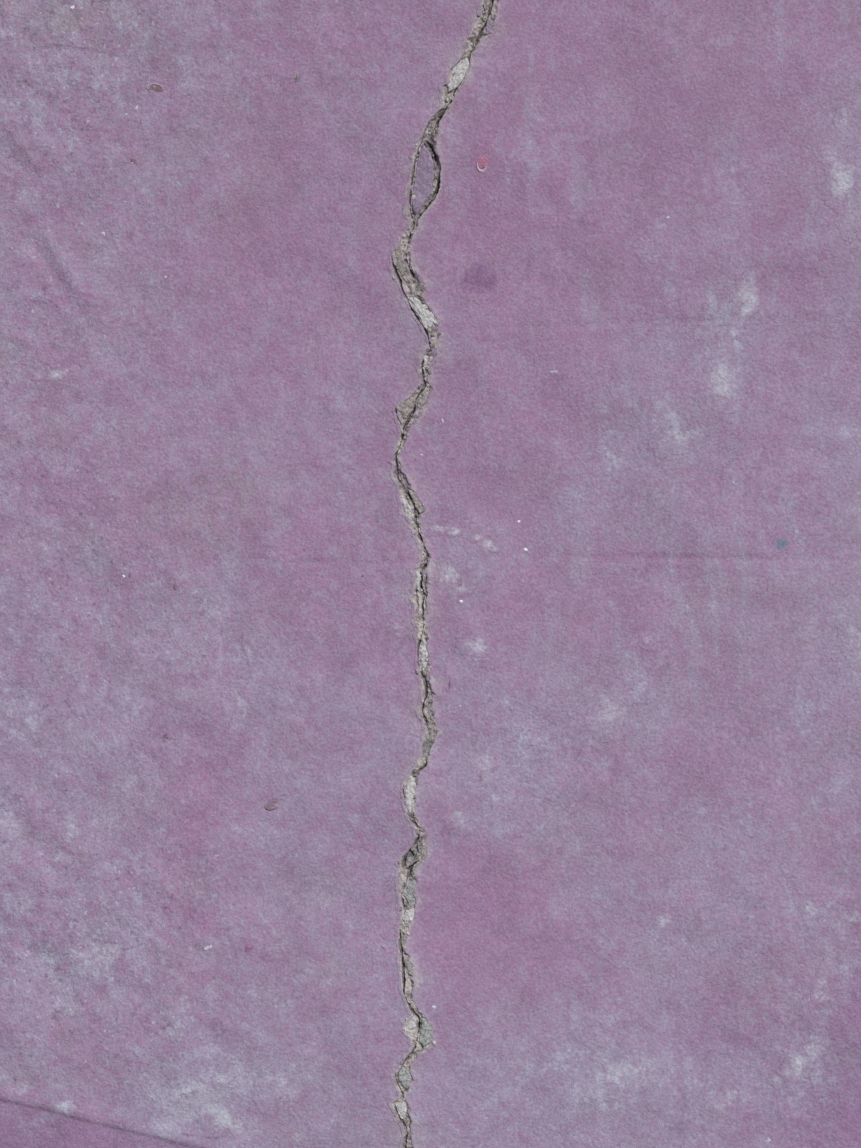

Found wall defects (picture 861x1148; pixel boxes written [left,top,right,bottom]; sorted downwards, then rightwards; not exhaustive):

crack [387,0,503,1148]